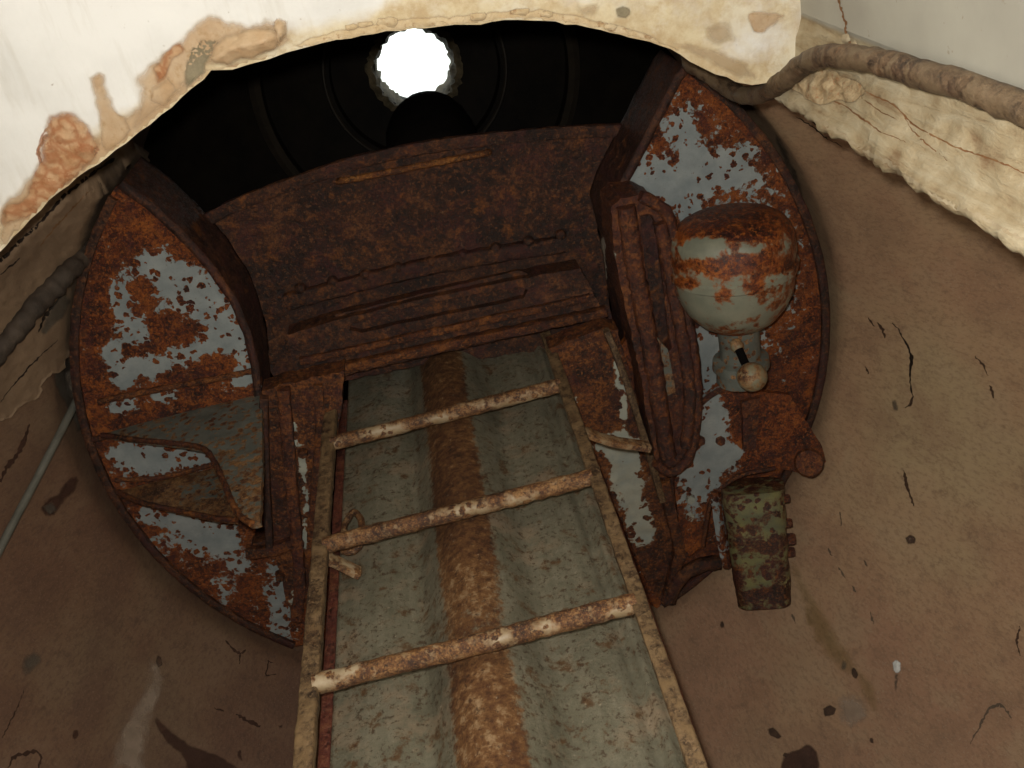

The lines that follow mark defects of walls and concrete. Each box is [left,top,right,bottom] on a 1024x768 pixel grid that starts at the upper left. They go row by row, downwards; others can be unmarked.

spalling [185,41,218,85]
flaking render [789,69,1024,243]
flaking render [0,138,150,334]
flaking render [0,278,80,429]
crack [868,317,914,408]
crack [975,356,994,398]
crack [903,470,914,506]
crack [970,703,1012,744]